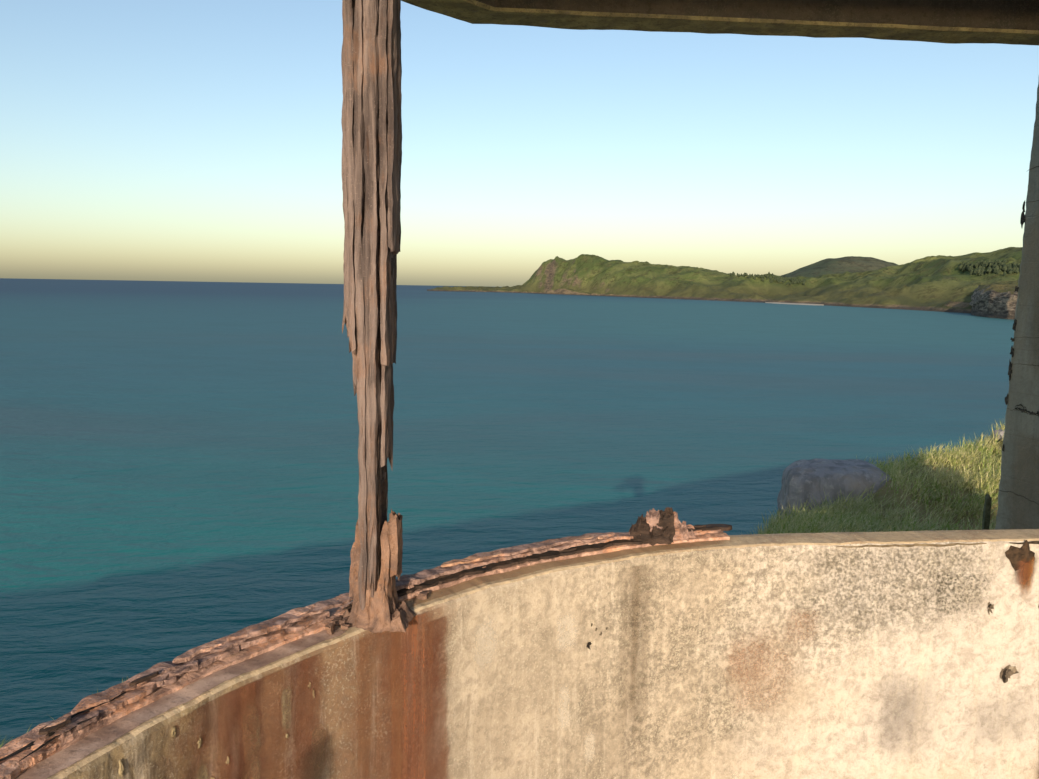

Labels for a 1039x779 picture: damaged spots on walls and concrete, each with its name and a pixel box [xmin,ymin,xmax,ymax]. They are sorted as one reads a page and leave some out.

corrosion [0,0,732,779]
crack [1007,404,1039,416]
corrosion [1005,540,1035,589]